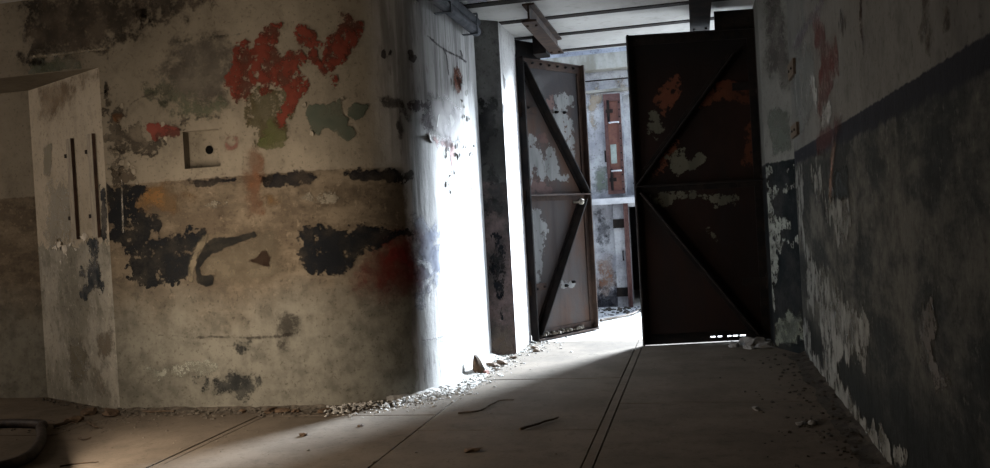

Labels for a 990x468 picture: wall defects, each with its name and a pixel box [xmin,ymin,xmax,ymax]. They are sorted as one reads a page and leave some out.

peeling [302,97,368,141]
peeling [52,82,207,301]
peeling [188,176,237,187]
peeling [260,169,316,188]
peeling [343,167,414,185]
peeling [296,222,415,276]
peeling [766,157,908,468]